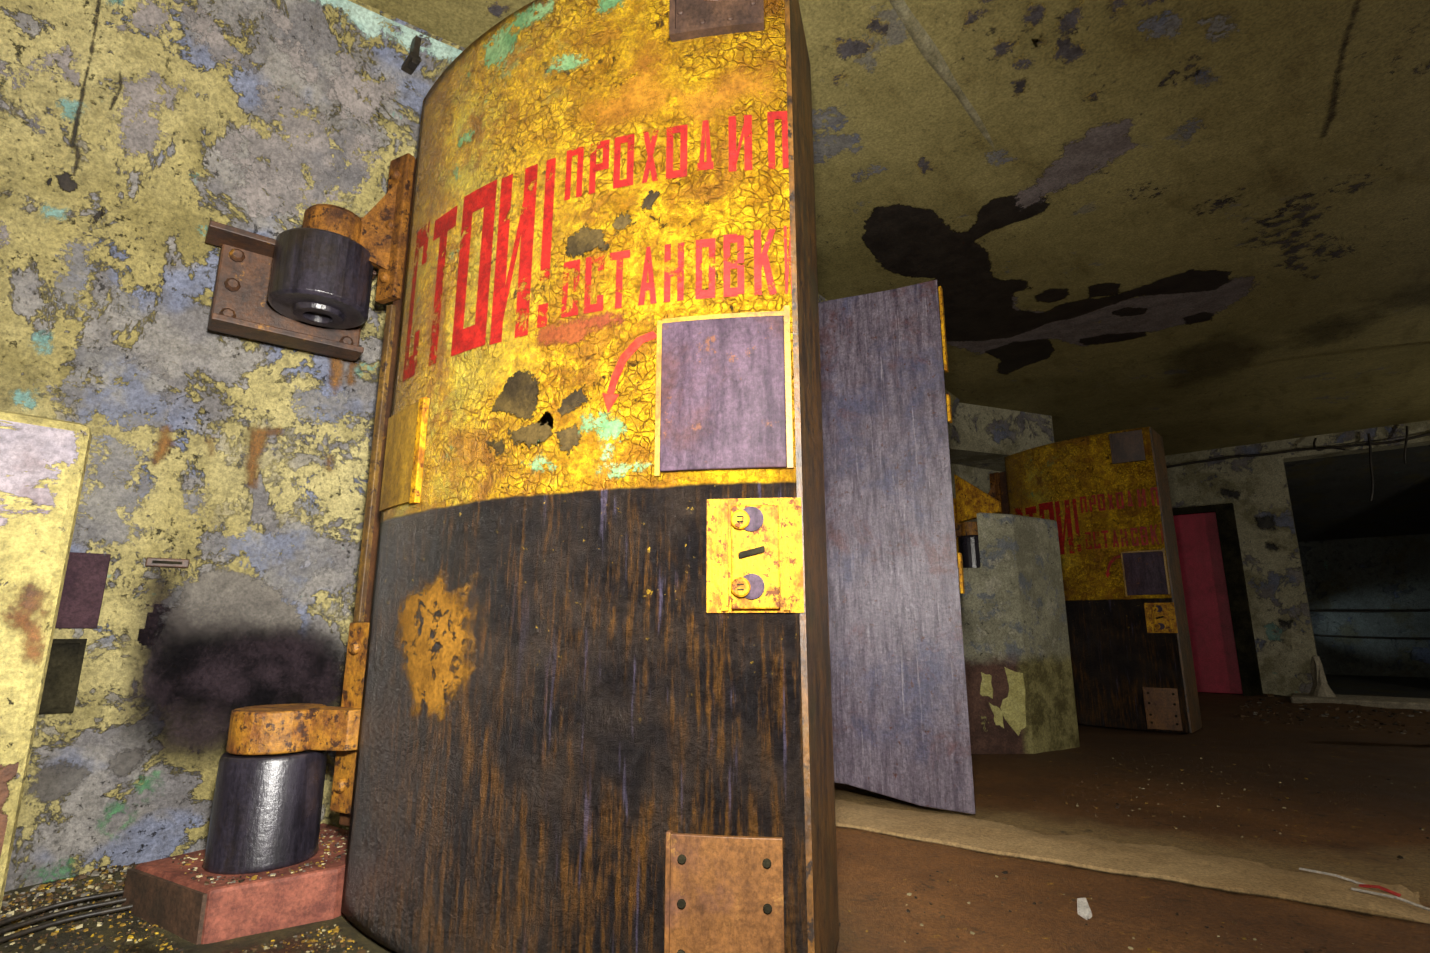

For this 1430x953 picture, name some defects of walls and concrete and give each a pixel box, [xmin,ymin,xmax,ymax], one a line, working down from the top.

peeling [0,45,83,119]
peeling [110,0,400,219]
peeling [311,0,463,61]
peeling [483,0,554,71]
spalling [832,17,890,86]
spalling [992,0,1088,98]
spalling [46,171,80,193]
spalling [947,276,1260,355]
peeling [485,369,650,478]
peeling [0,344,342,650]
corrosion [396,578,475,718]
flaking render [0,758,90,856]